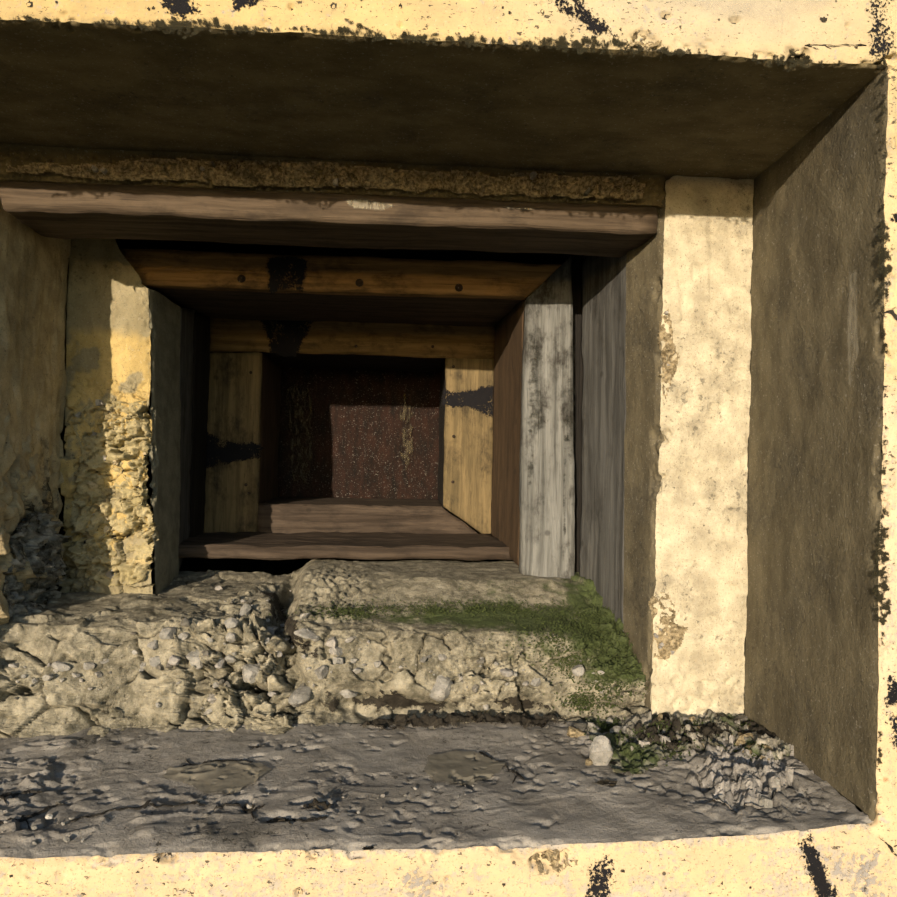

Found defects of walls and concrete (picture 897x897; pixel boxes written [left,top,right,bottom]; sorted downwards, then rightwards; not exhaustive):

peeling [2,398,159,625]
crack [0,789,327,830]